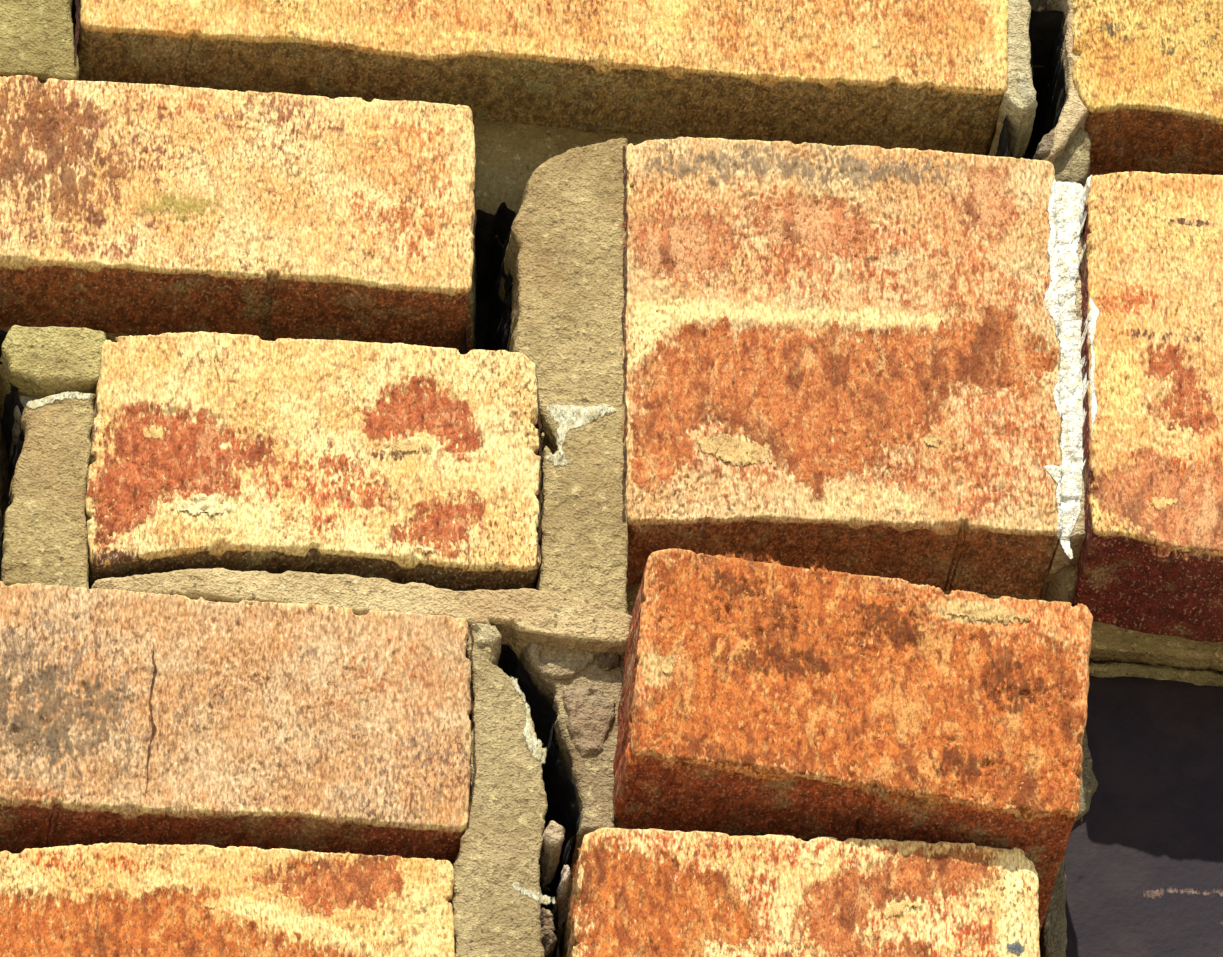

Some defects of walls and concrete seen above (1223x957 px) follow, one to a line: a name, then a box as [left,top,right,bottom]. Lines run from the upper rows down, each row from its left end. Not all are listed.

crack [995,9,1065,160]
crack [460,202,516,355]
leakage [1044,175,1099,559]
crack [536,375,544,570]
crack [467,627,581,957]